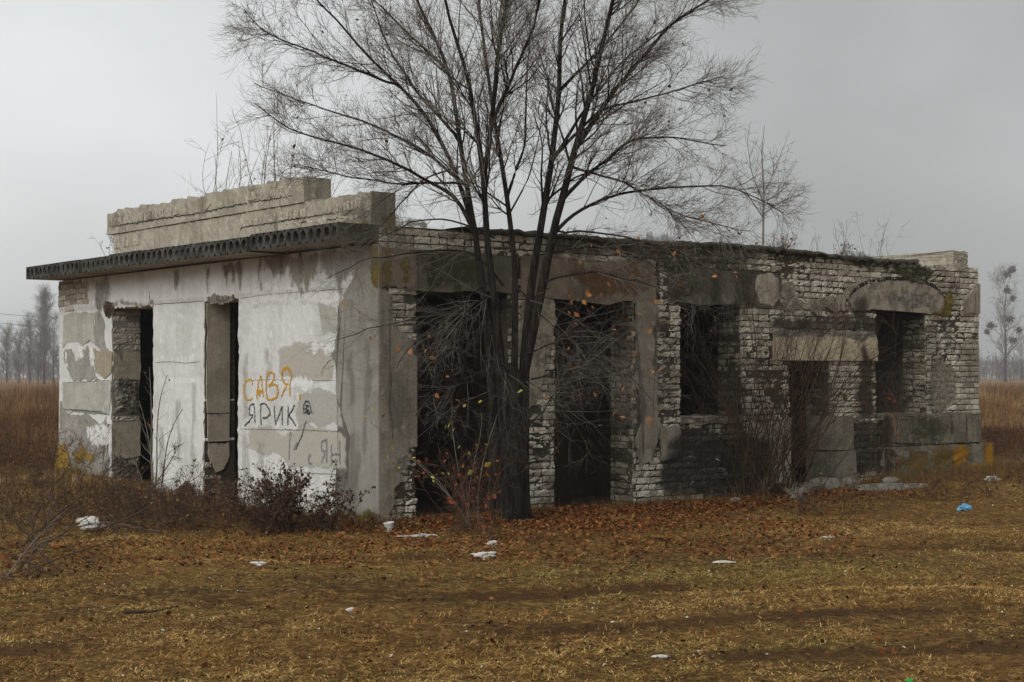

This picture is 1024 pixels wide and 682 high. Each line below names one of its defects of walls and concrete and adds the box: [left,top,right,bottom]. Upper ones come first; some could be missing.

damp [223,261,242,289]
damp [258,247,353,296]
peeling [55,279,140,481]
peeling [207,281,346,470]